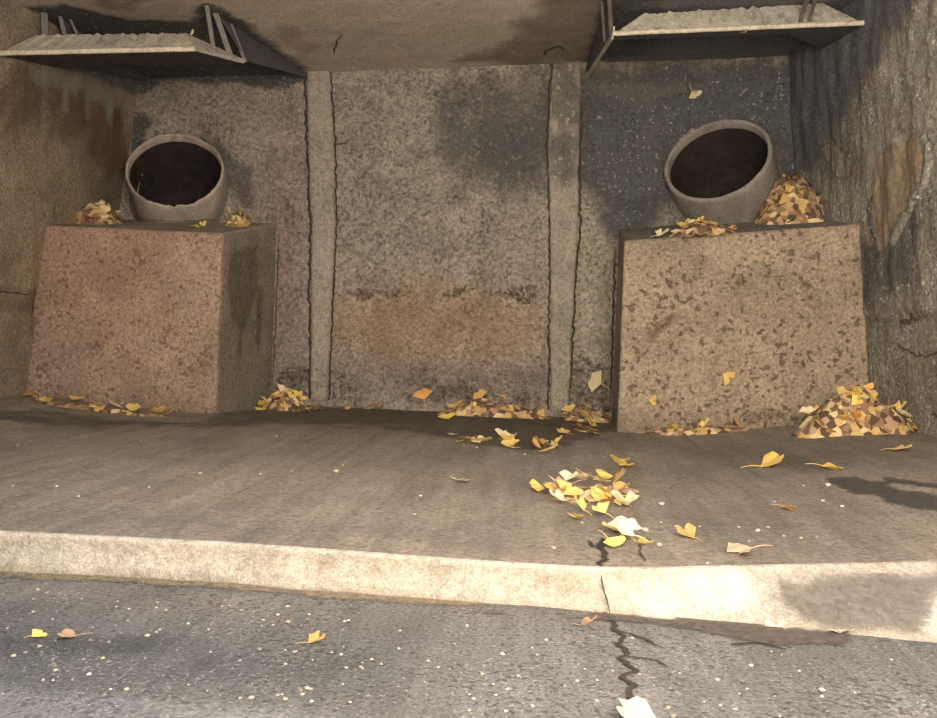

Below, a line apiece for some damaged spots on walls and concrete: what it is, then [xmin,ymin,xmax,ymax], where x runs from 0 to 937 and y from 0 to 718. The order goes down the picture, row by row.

crack [303,35,347,400]
crack [543,46,583,410]
spalling [868,133,933,254]
crack [272,230,280,389]
crack [895,313,937,358]
leakage [829,477,937,509]
crack [587,538,668,699]
crack [731,641,786,649]